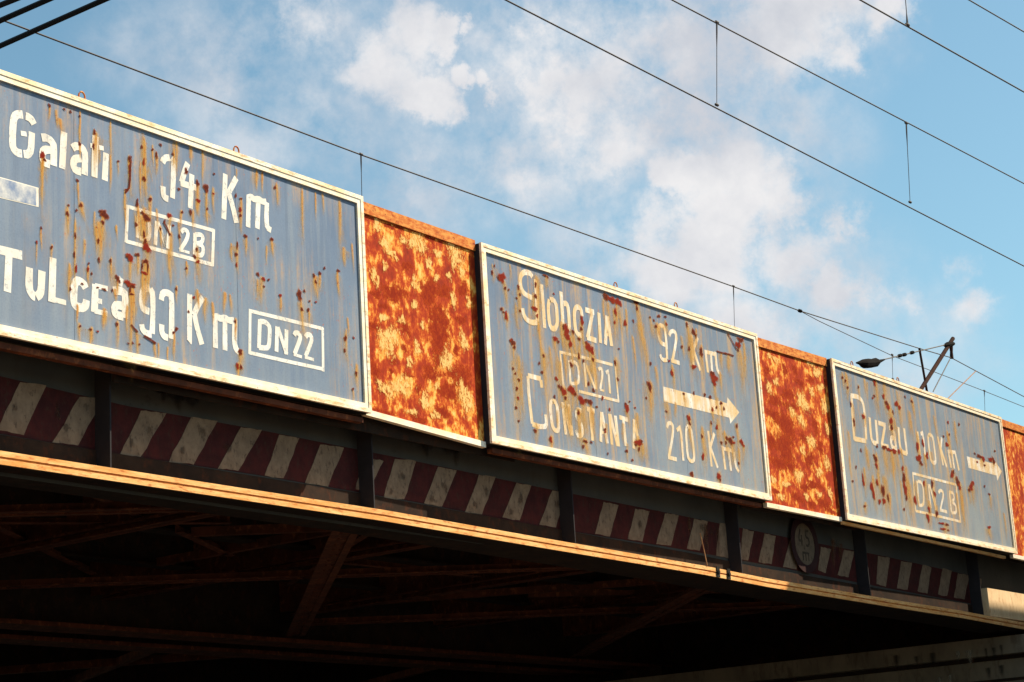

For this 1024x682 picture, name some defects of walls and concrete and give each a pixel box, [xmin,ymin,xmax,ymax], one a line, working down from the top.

rust [48,103,97,155]
rust [66,121,215,359]
rust [297,245,354,326]
rust [352,277,472,423]
rust [491,264,611,450]
rust [623,401,643,461]
rust [602,292,668,407]
rust [665,322,745,465]
rust [763,363,835,515]
rust [842,373,934,467]
rust [849,444,949,531]
rust [951,470,991,520]